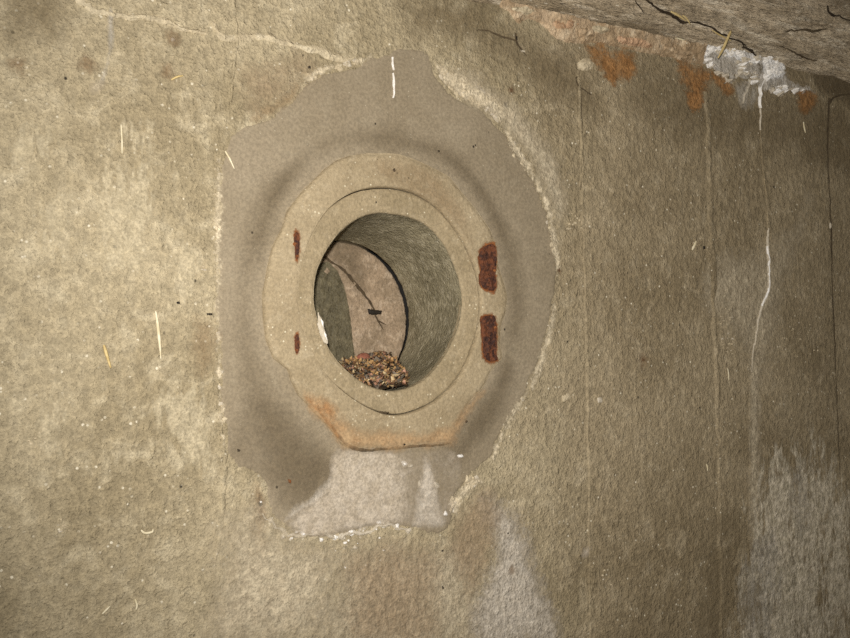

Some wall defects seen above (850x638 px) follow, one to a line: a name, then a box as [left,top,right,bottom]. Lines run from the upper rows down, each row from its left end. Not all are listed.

crack [635,0,757,56]
crack [780,5,850,61]
rust [677,60,734,109]
water stain [704,44,810,130]
rust [478,242,497,294]
rust [480,314,498,364]
water stain [291,452,454,550]